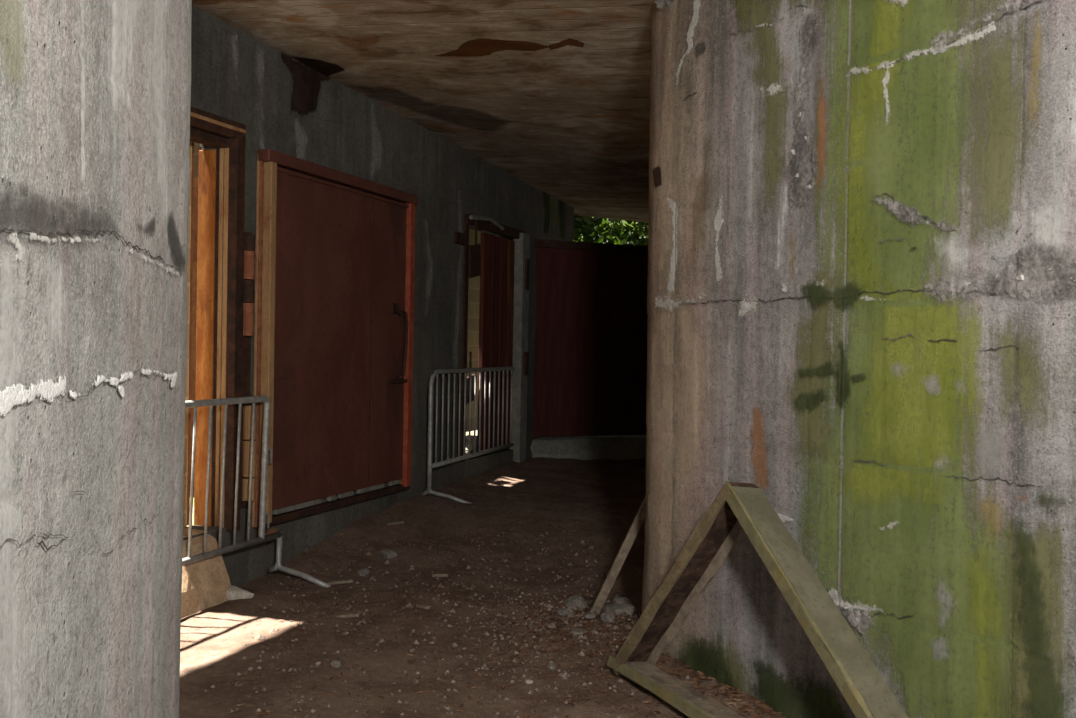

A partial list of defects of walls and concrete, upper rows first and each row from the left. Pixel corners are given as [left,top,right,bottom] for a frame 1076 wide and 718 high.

leakage [281,53,344,159]
leakage [436,39,584,57]
crack [850,0,1042,126]
crack [0,227,182,276]
leakage [652,78,679,292]
leakage [694,171,724,281]
crack [655,289,934,312]
crack [0,368,180,417]
leakage [657,307,705,576]
crack [0,533,68,550]
crack [98,514,157,555]
leakage [971,521,1069,718]